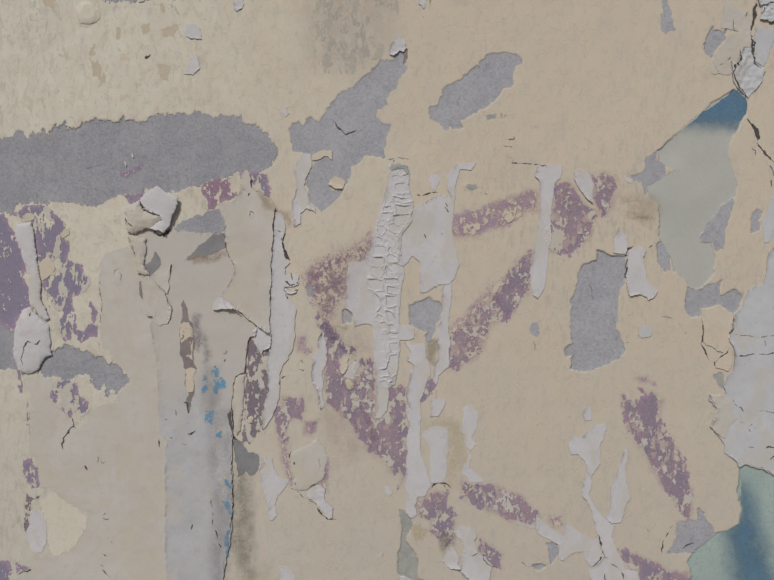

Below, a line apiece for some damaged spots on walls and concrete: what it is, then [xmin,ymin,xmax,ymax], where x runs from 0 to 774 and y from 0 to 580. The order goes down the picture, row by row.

peeling [428,52,522,130]
peeling [0,110,278,398]
peeling [231,34,407,520]
flaking render [342,162,476,580]
flaking render [529,165,562,298]
flaking render [574,169,594,203]
peeling [564,227,658,372]
peeling [625,0,774,580]
flaking render [442,526,493,580]
flaking render [459,405,484,483]
flaking render [532,407,640,580]